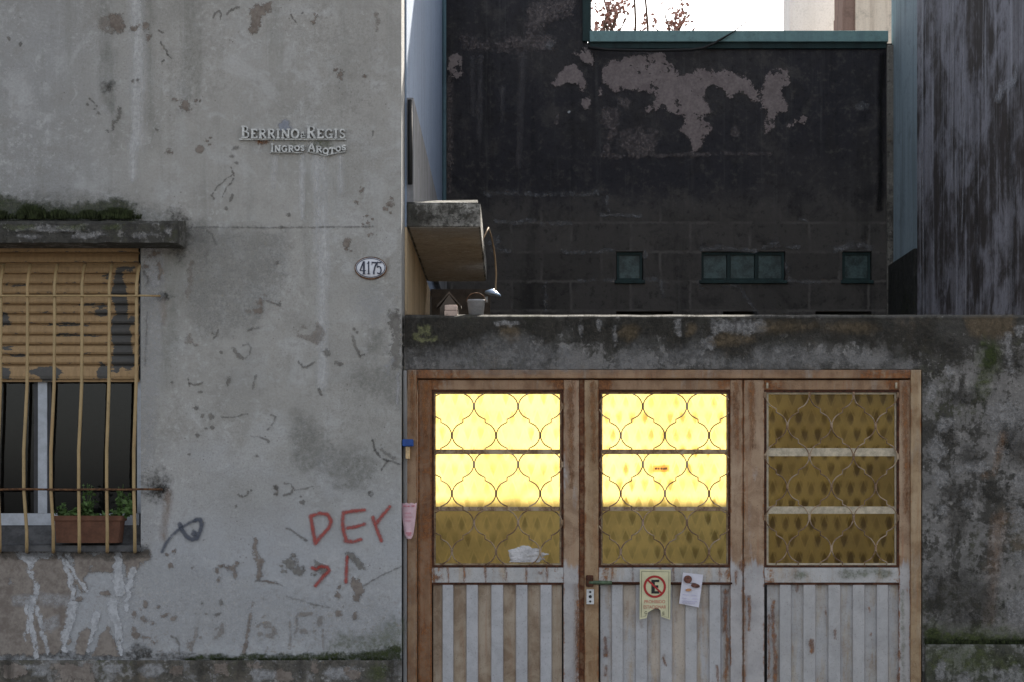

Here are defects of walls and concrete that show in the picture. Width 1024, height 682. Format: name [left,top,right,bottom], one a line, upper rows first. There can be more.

peeling [447,53,464,79]
peeling [551,47,808,155]
water stain [402,296,967,362]
water stain [1,547,183,660]